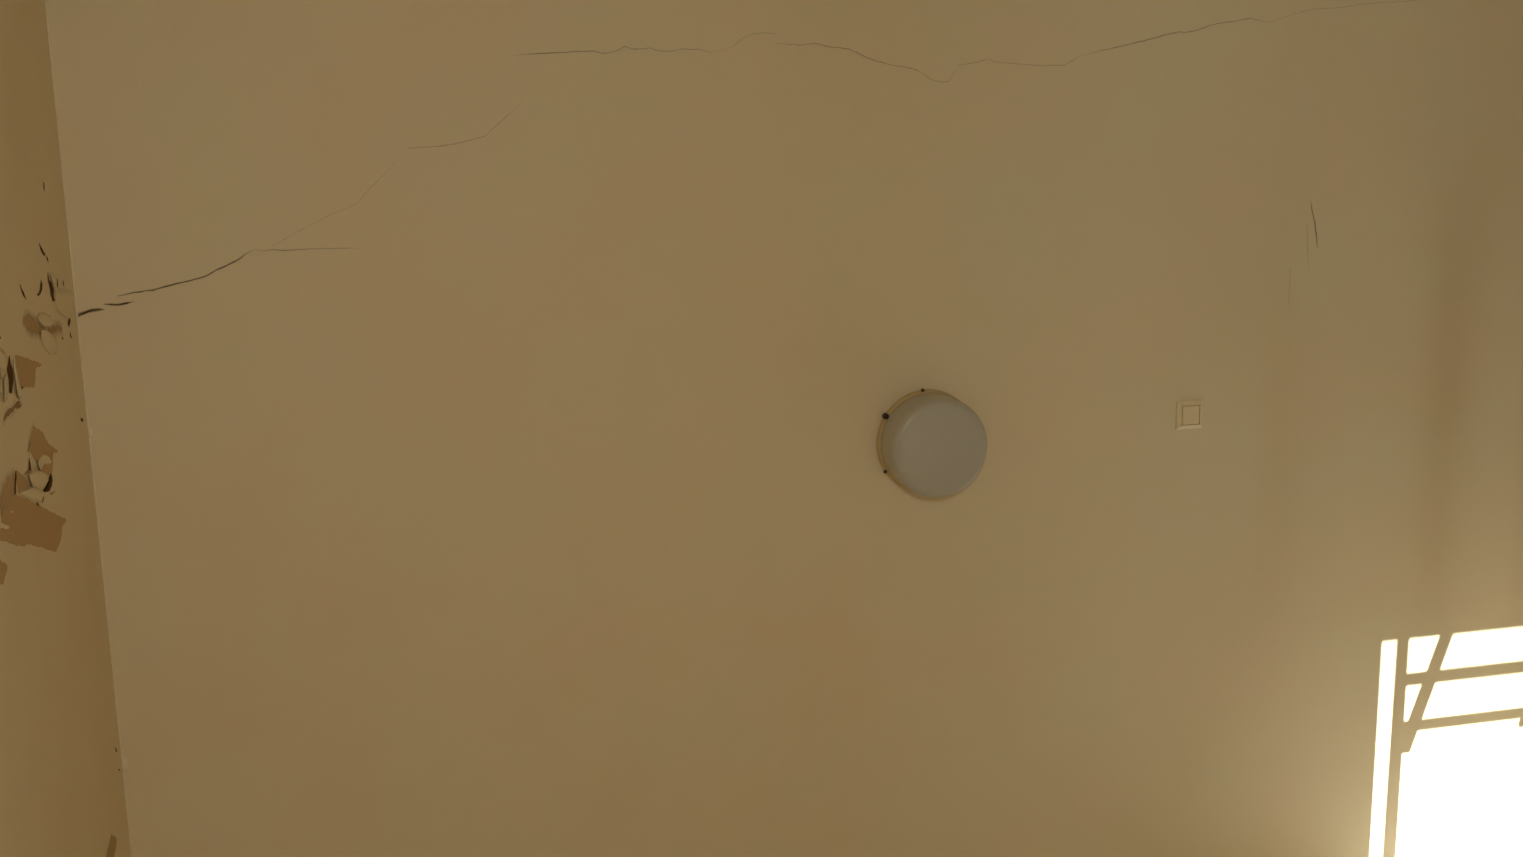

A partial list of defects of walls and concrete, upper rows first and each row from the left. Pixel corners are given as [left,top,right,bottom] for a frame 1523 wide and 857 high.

peeling [0,243,74,421]
crack [78,253,247,316]
peeling [0,427,66,552]